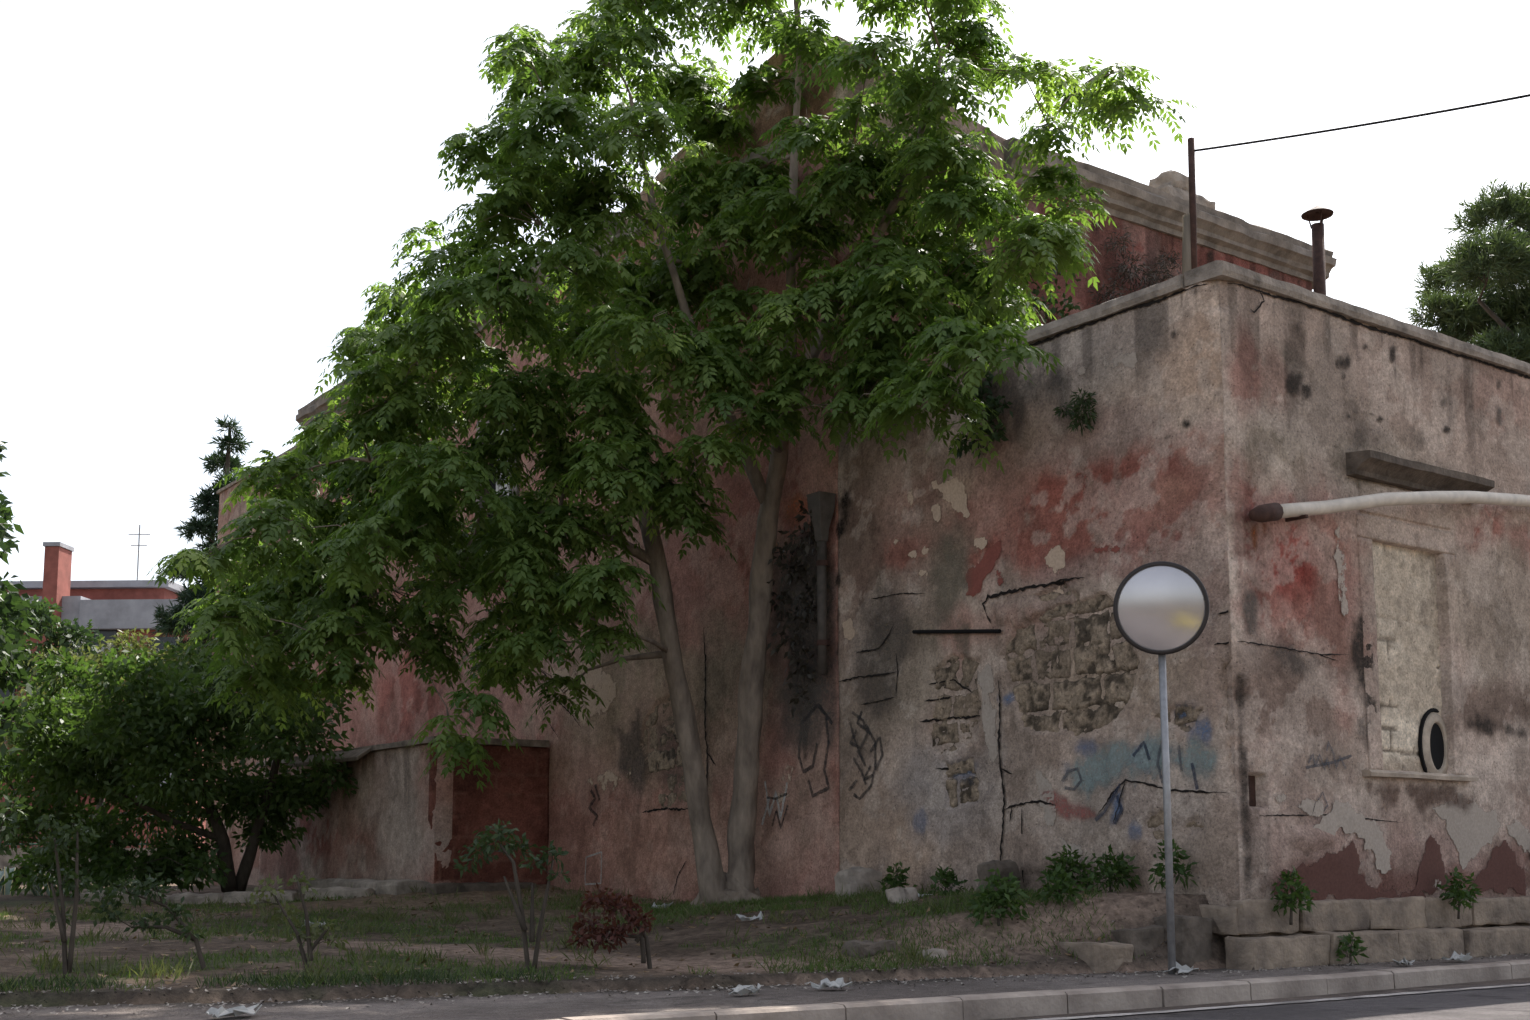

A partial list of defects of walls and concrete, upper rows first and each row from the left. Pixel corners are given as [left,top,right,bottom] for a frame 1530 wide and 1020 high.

leakage [1287,374,1311,398]
spalling [931,537,1140,808]
spalling [1155,704,1203,732]
peeling [1274,793,1530,900]